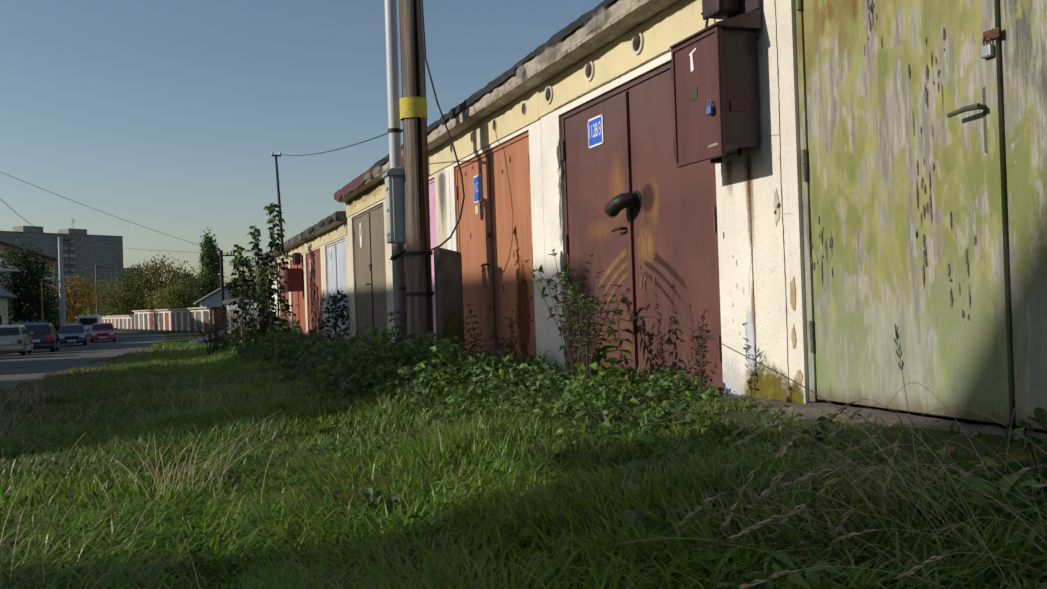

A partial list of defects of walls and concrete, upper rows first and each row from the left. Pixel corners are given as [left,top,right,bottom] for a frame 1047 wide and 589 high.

rust [611,168,624,199]
rust [503,225,532,363]
rust [600,186,679,302]